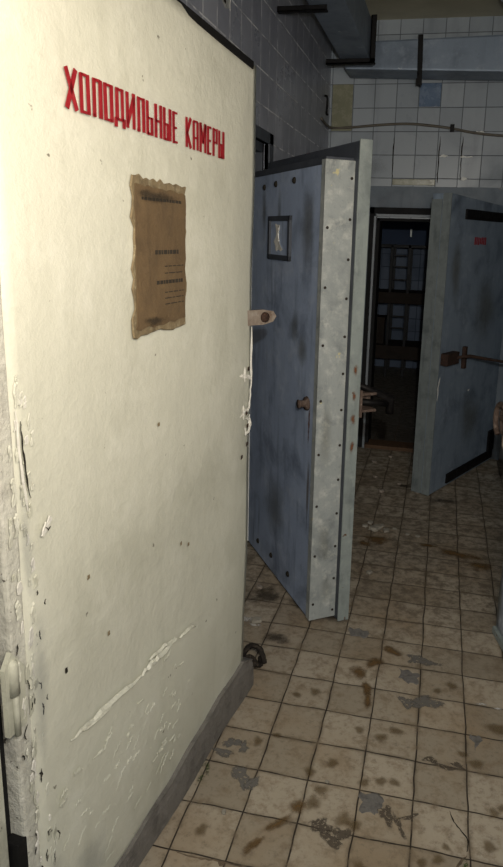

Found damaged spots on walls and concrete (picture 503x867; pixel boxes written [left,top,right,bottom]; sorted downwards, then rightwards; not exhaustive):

peeling [8,375,61,867]
spalling [398,655,441,685]
spalling [398,695,445,709]
spalling [212,738,249,758]
spalling [232,766,258,791]
spalling [358,792,418,838]
spalling [311,818,351,849]
crack [450,812,469,851]